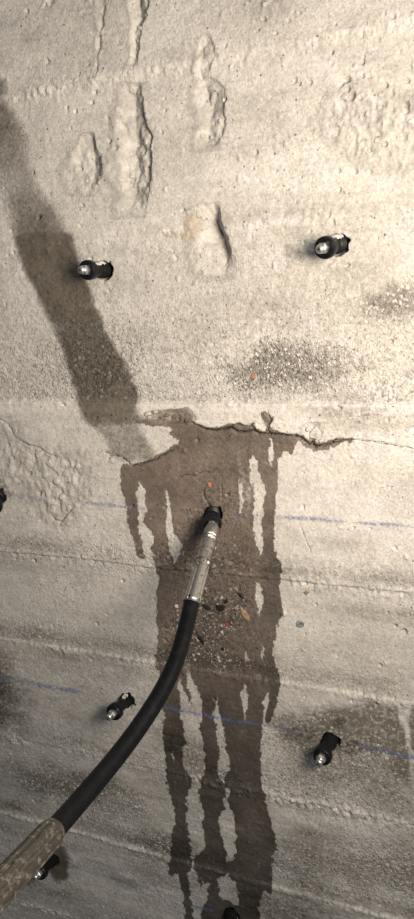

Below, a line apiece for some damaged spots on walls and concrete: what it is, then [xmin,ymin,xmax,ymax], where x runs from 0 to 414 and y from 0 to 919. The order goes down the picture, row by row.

water stain [0,82,20,161]
crack [199,418,411,448]
water stain [16,196,352,919]
water stain [397,632,414,789]